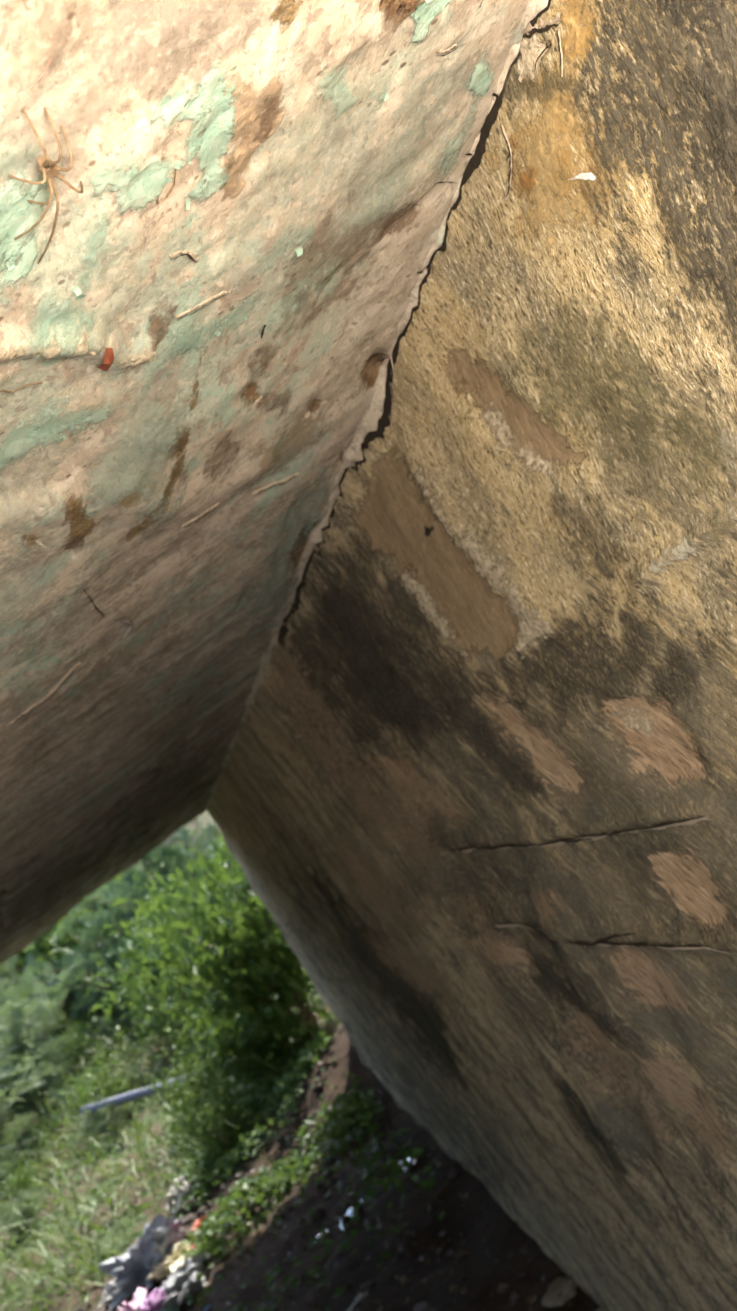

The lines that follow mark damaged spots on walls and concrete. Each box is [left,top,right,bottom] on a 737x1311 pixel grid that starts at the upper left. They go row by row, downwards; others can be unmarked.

peeling [379,0,452,43]
peeling [0,66,236,363]
water stain [486,0,737,363]
crack [277,0,563,648]
spalling [351,445,555,663]
water stain [552,498,628,579]
water stain [284,536,716,800]
water stain [422,822,678,1179]
crack [437,816,714,854]
crack [492,922,737,956]
spalling [601,696,706,790]
spalling [648,847,728,929]